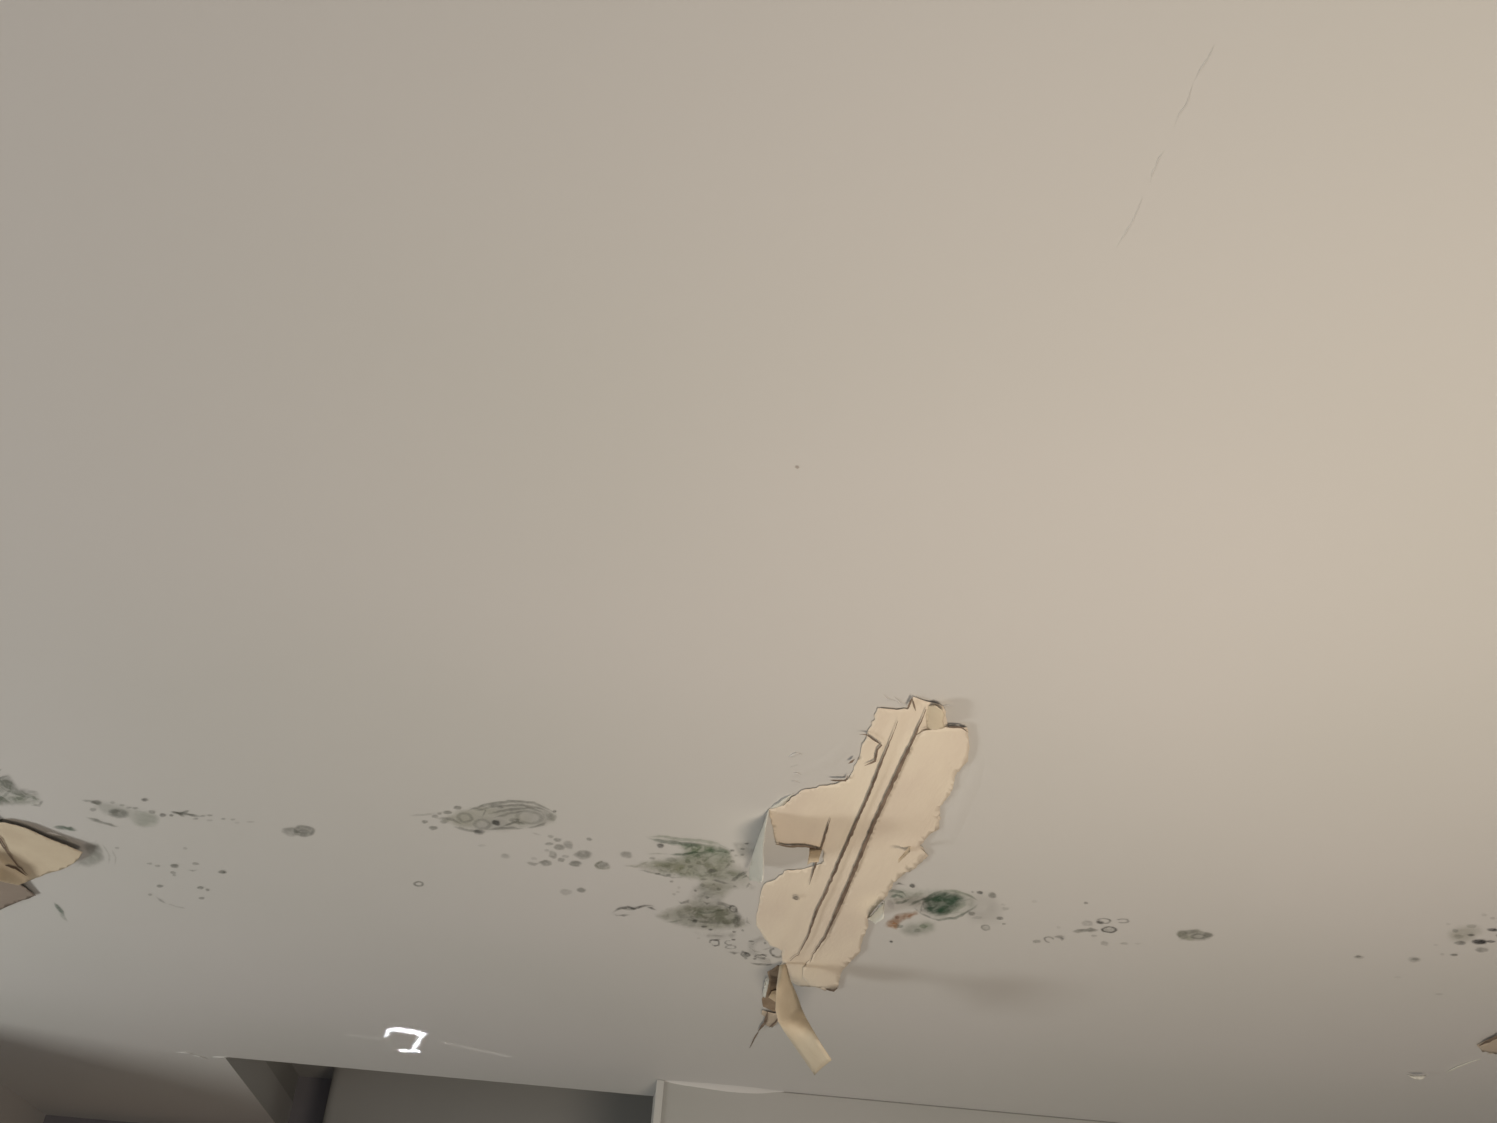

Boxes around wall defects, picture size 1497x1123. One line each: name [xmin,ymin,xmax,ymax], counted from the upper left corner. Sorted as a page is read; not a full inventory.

spalling [762,965,779,1012]